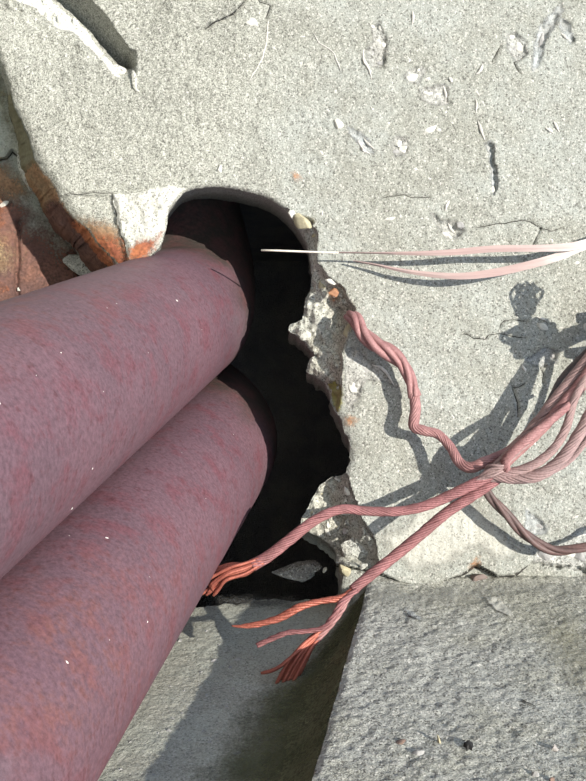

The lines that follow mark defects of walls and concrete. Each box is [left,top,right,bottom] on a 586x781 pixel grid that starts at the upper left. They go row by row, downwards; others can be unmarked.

crack [204,0,271,81]
rust [0,163,155,301]
peeling [113,186,183,260]
crack [477,220,560,244]
spalling [291,216,395,413]
crack [461,319,522,340]
spalling [303,474,380,585]
crack [334,560,394,580]
crack [444,565,527,581]
water stain [219,592,365,781]